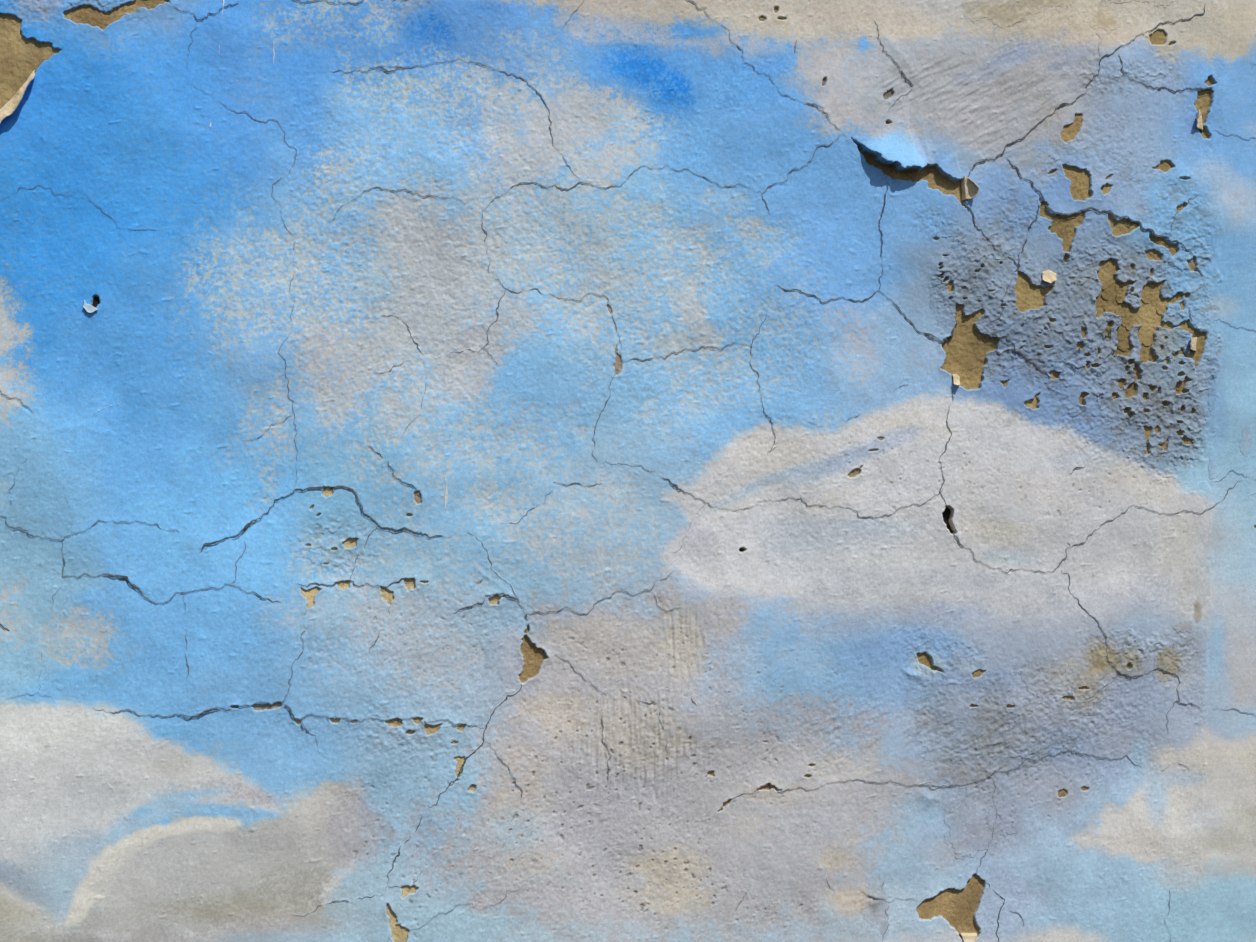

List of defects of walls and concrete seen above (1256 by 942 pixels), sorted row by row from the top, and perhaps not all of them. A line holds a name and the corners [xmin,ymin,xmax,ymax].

peeling [0,15,59,124]
peeling [64,0,168,30]
peeling [857,146,979,206]
crack [777,6,1210,377]
peeling [1001,165,1111,322]
peeling [939,255,997,390]
peeling [1077,236,1205,454]
crack [5,0,973,916]
crack [953,470,1256,729]
crack [730,750,1203,869]
crack [826,877,920,942]
peeling [916,874,1005,942]